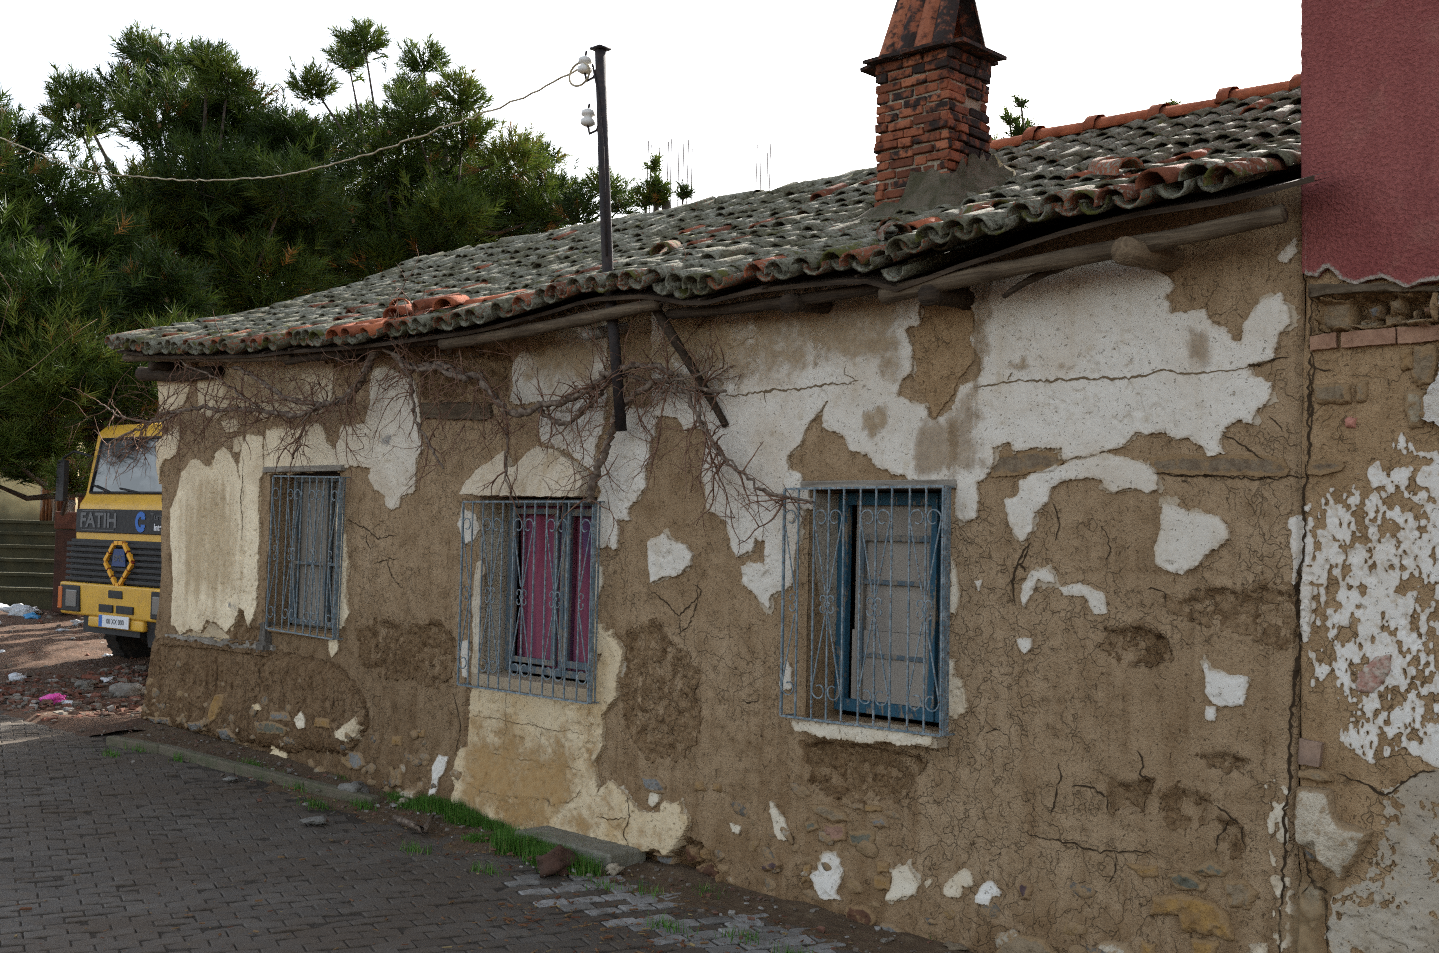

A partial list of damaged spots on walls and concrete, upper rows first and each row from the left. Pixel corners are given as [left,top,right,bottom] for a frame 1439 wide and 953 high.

flaking render [147,260,1439,953]
crack [973,288,1334,953]
crack [1337,770,1435,796]